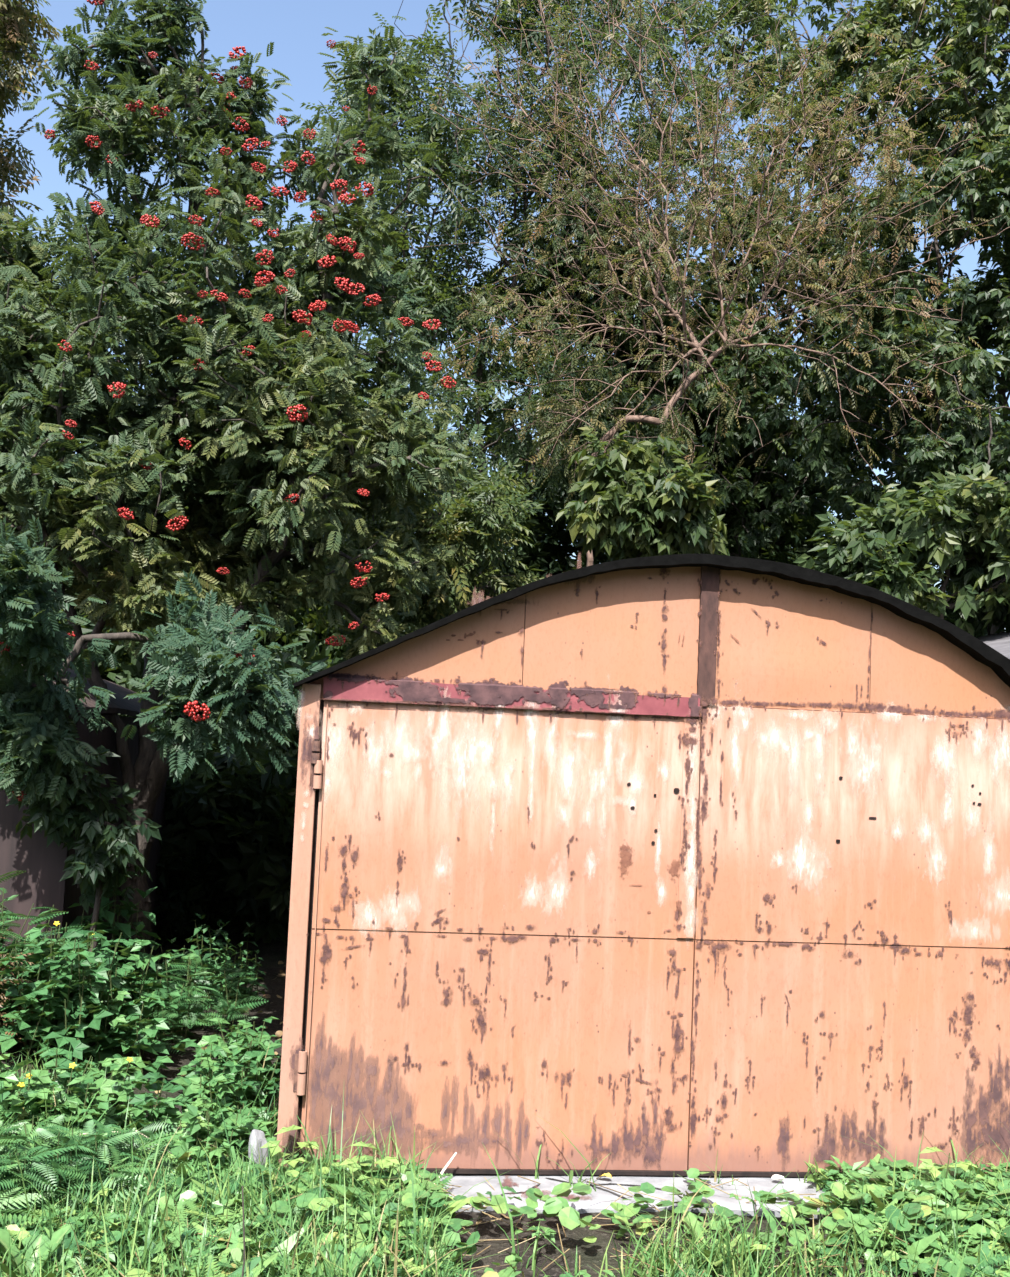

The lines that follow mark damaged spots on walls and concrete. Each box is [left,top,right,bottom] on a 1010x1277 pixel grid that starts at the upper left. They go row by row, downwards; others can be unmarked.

corrosion [472,590,527,612]
corrosion [567,556,595,593]
corrosion [649,568,669,670]
corrosion [280,611,1010,1177]